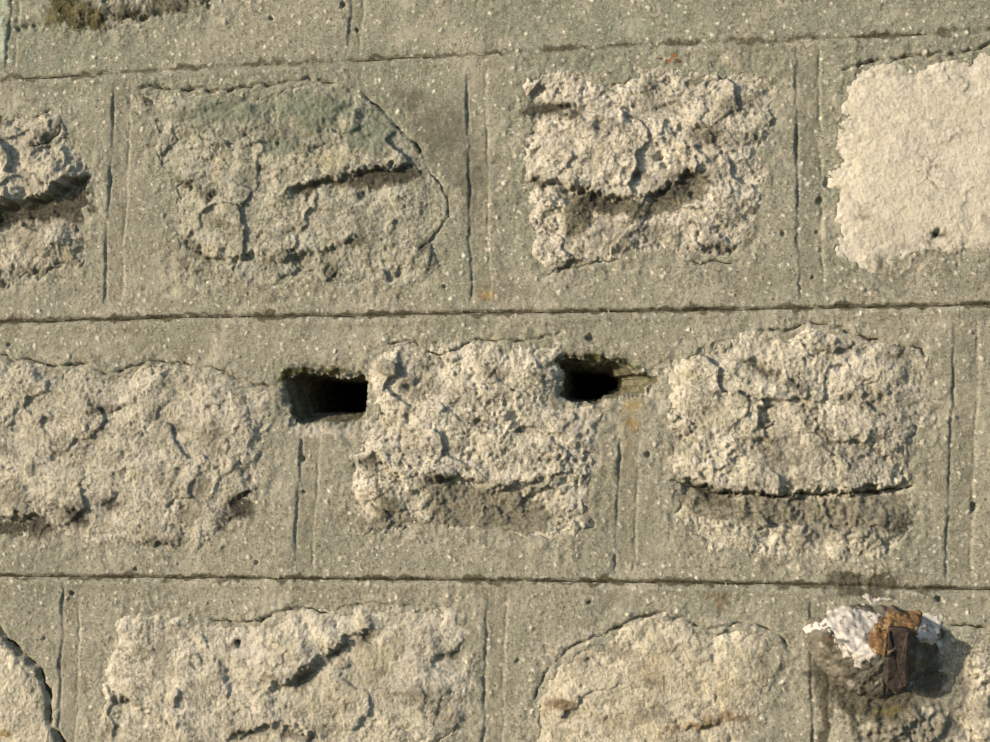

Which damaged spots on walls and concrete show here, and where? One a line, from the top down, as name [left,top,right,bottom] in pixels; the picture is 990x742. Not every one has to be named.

corrosion [866,609,922,657]